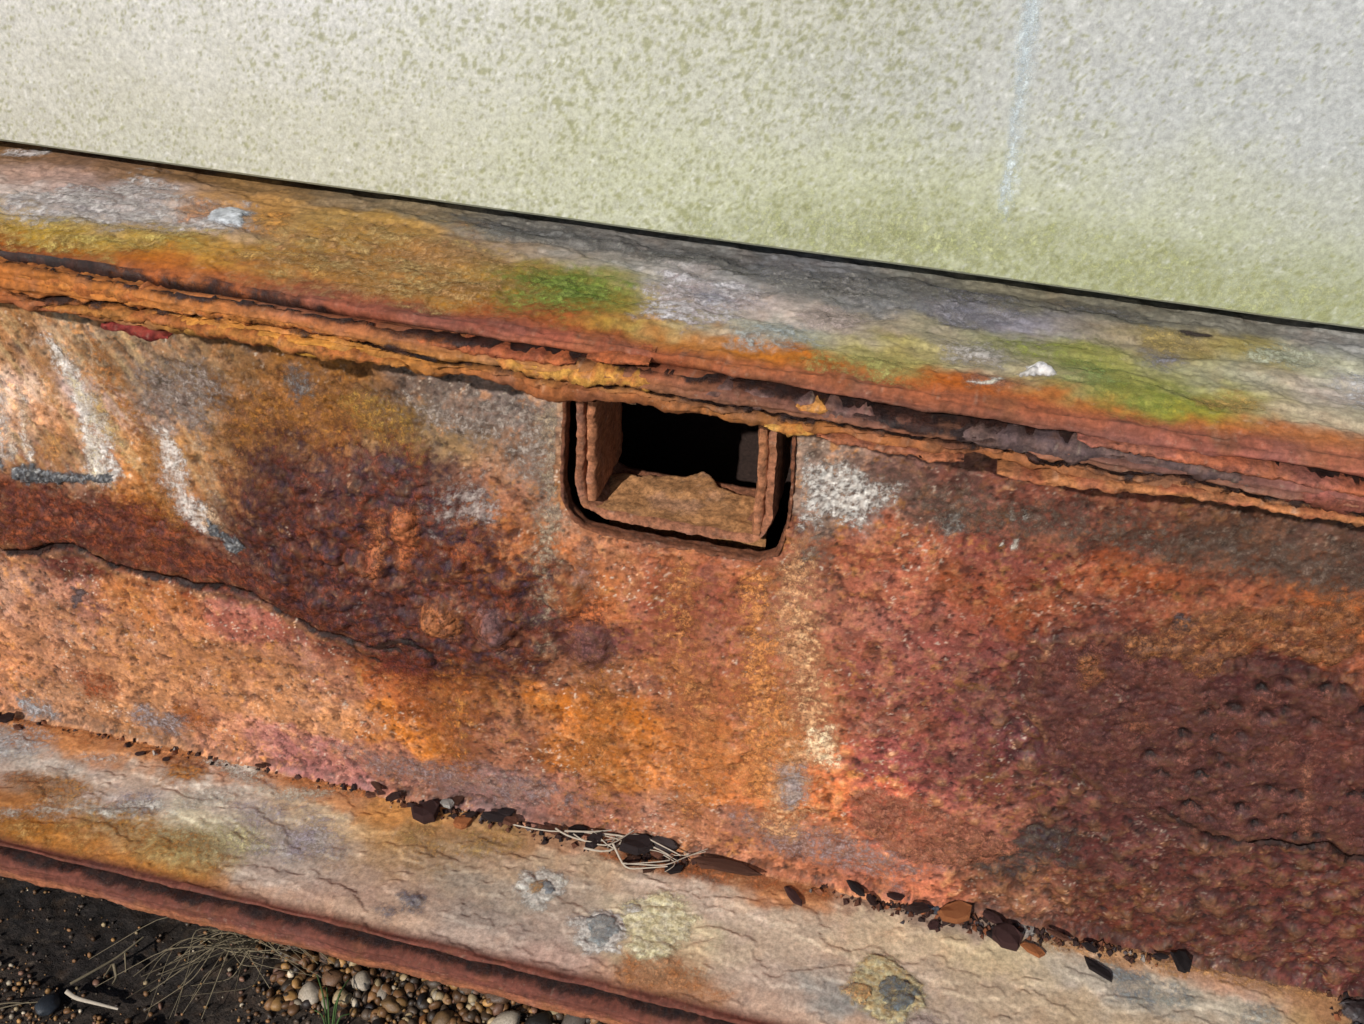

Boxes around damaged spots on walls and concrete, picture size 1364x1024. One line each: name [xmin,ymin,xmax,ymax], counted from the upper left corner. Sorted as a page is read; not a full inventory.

corrosion [236,211,1220,359]
corrosion [417,334,657,393]
corrosion [0,201,423,646]
corrosion [689,376,1364,678]
crack [0,542,436,663]
corrosion [0,712,267,783]
corrosion [395,795,523,858]
corrosion [538,825,940,930]
corrosion [850,788,1020,867]
peeling [1018,923,1049,938]
corrosion [982,910,1332,1024]
peeling [1338,996,1364,1024]